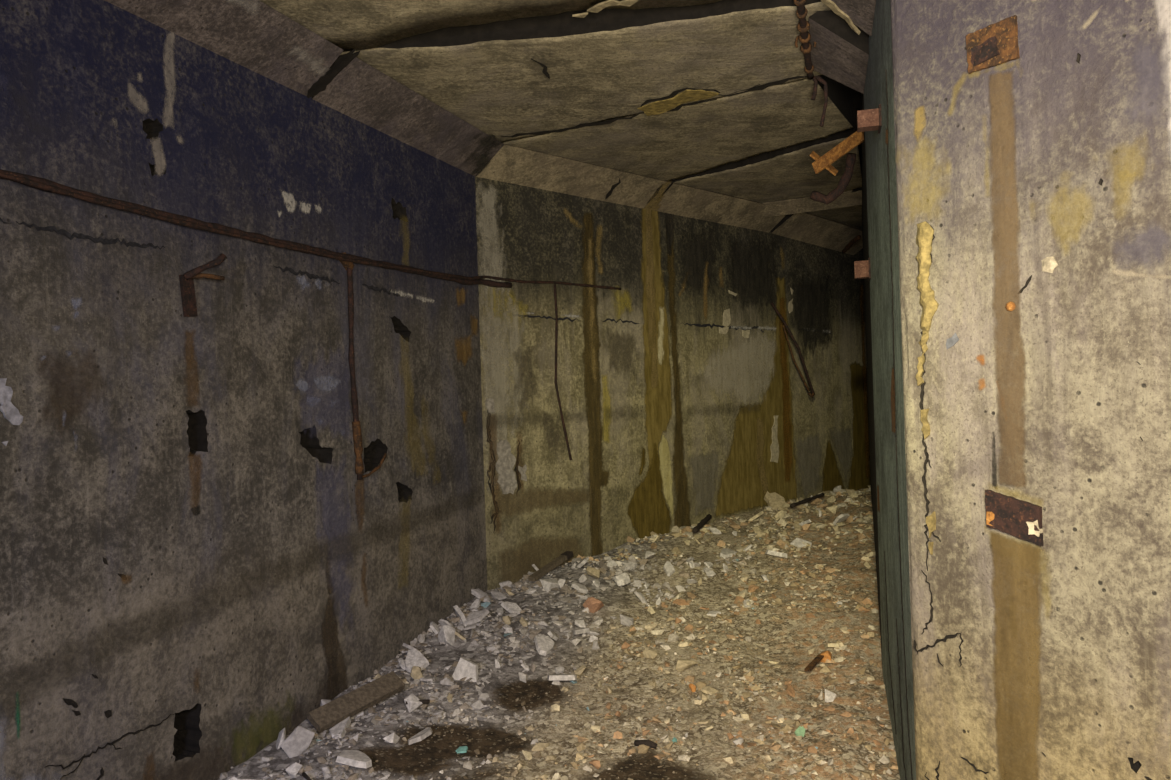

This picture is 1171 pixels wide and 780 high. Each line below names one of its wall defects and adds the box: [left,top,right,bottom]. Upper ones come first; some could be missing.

crack [501,76,807,138]
peeling [0,378,23,425]
hole [299,425,333,464]
hole [363,438,388,472]
spalling [396,482,413,503]
damp [478,188,611,582]
peeling [659,435,673,515]
damp [628,182,870,539]
peeling [770,415,779,463]
crack [884,69,989,780]
crack [46,714,174,780]
hole [172,703,202,762]